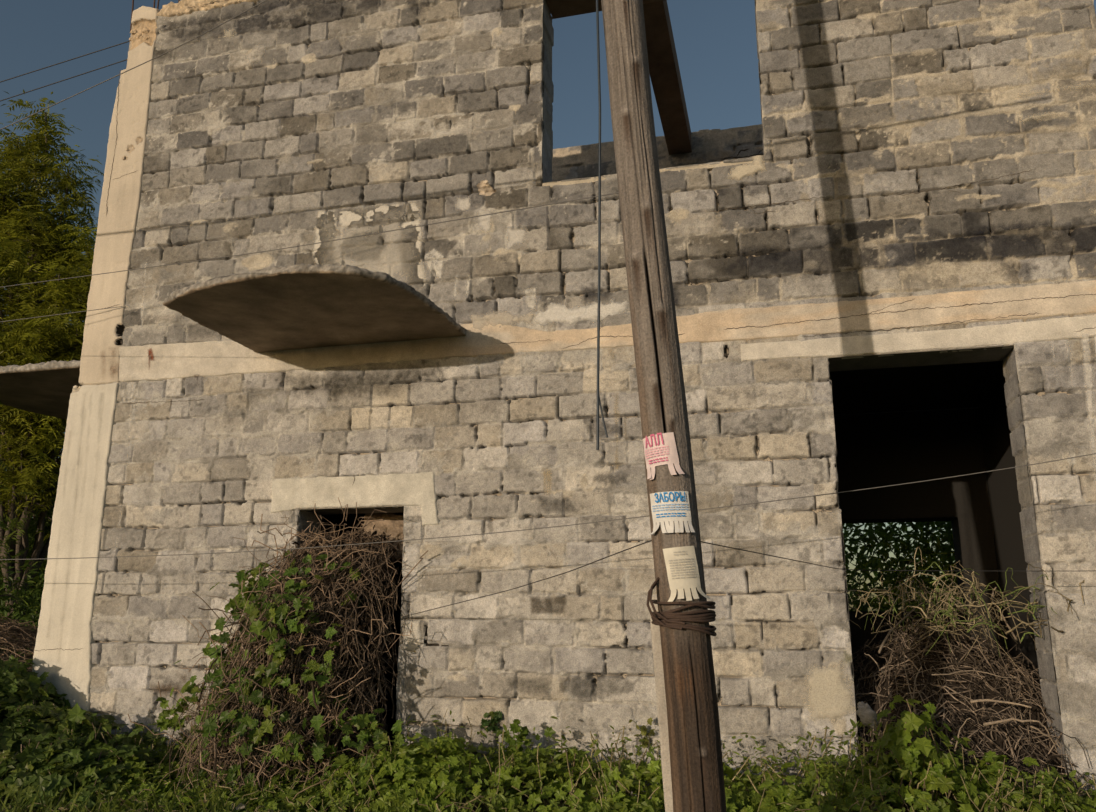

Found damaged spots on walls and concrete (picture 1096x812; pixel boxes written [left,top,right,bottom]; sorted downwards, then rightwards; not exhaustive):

spalling [129,0,160,50]
leakage [457,198,491,231]
leakage [313,203,443,286]
leakage [507,227,526,248]
leakage [525,289,536,308]
crack [725,294,1096,337]